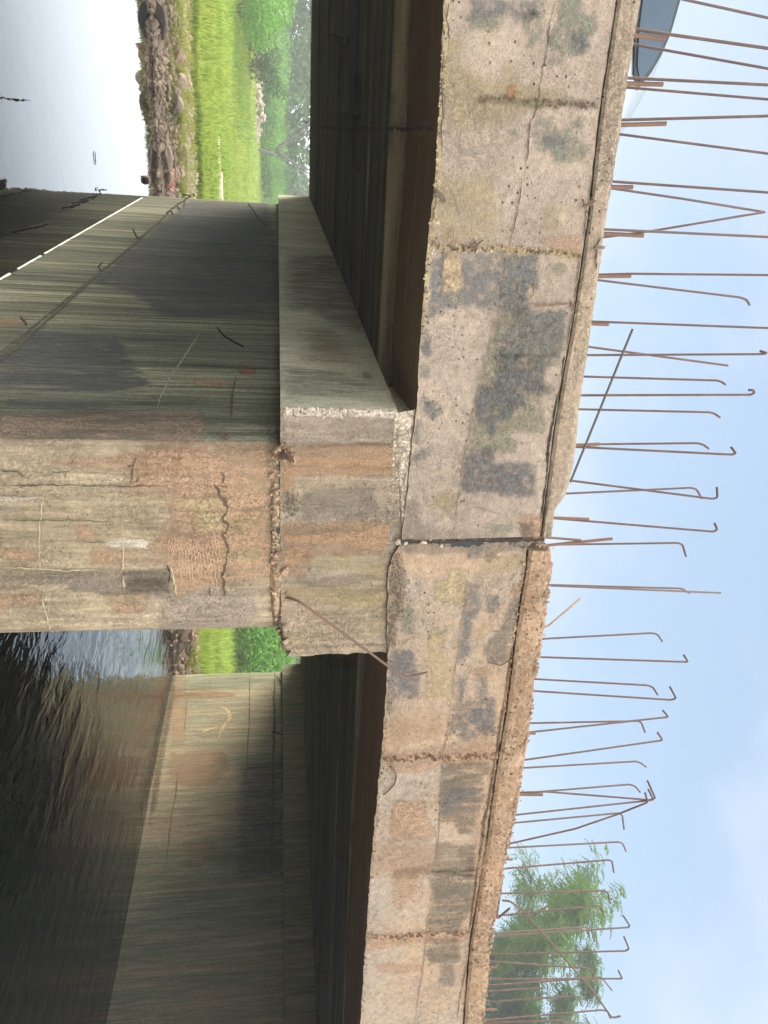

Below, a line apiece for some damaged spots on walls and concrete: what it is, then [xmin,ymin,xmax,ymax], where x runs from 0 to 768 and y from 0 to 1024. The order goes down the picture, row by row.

water stain [97,201,361,327]
crack [453,2,556,537]
water stain [428,253,565,497]
water stain [0,330,271,630]
crack [209,473,232,598]
spalling [282,482,304,522]
corrosion [517,516,542,536]
water stain [440,763,490,834]
water stain [426,843,475,987]